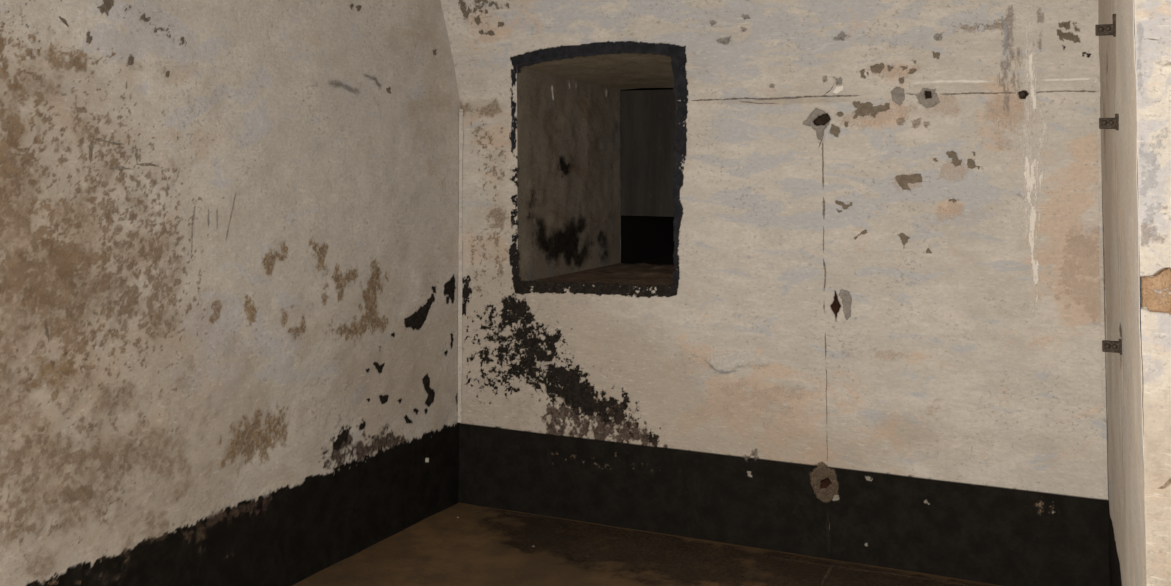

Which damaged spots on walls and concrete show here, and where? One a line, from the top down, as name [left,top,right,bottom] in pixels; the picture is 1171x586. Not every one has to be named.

leakage [97,0,186,46]
spalling [860,61,917,84]
spalling [813,101,928,137]
spalling [896,174,922,190]
spalling [933,151,980,179]
leakage [0,11,201,576]
leakage [460,100,667,448]
spalling [1141,268,1171,314]
leakage [323,420,406,474]
spalling [820,478,839,501]